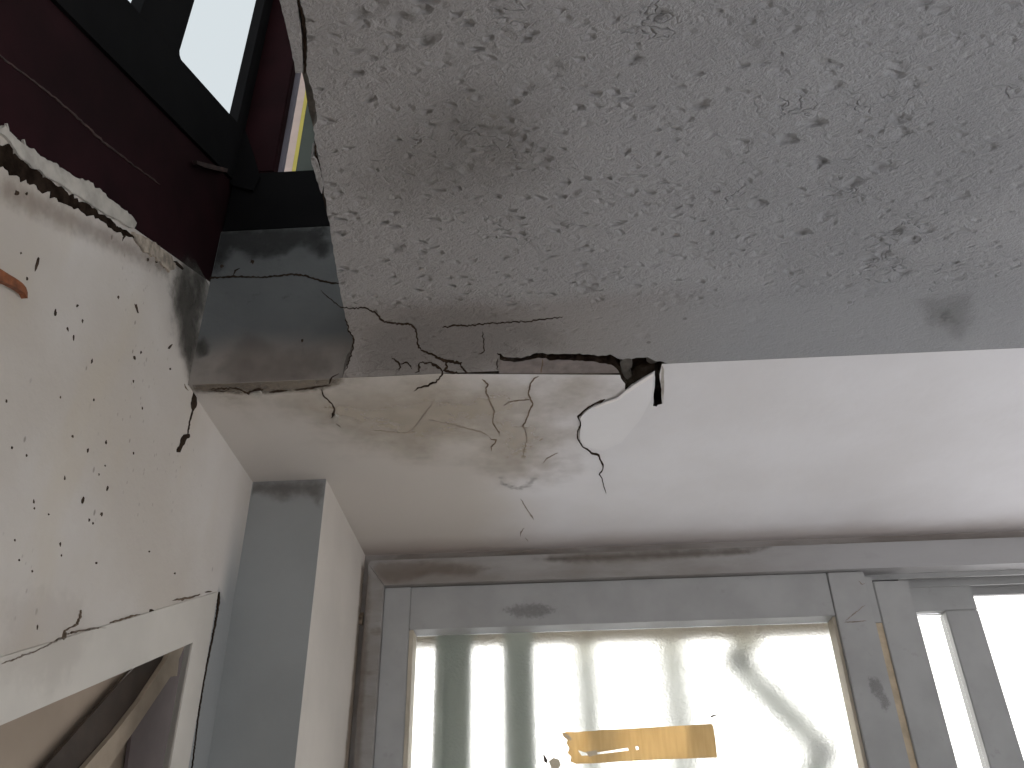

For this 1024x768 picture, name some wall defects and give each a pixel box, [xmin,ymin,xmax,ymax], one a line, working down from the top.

flaking render [0,123,176,272]
crack [209,268,606,492]
peeling [580,357,664,451]
crack [3,610,140,664]
crack [172,591,220,768]